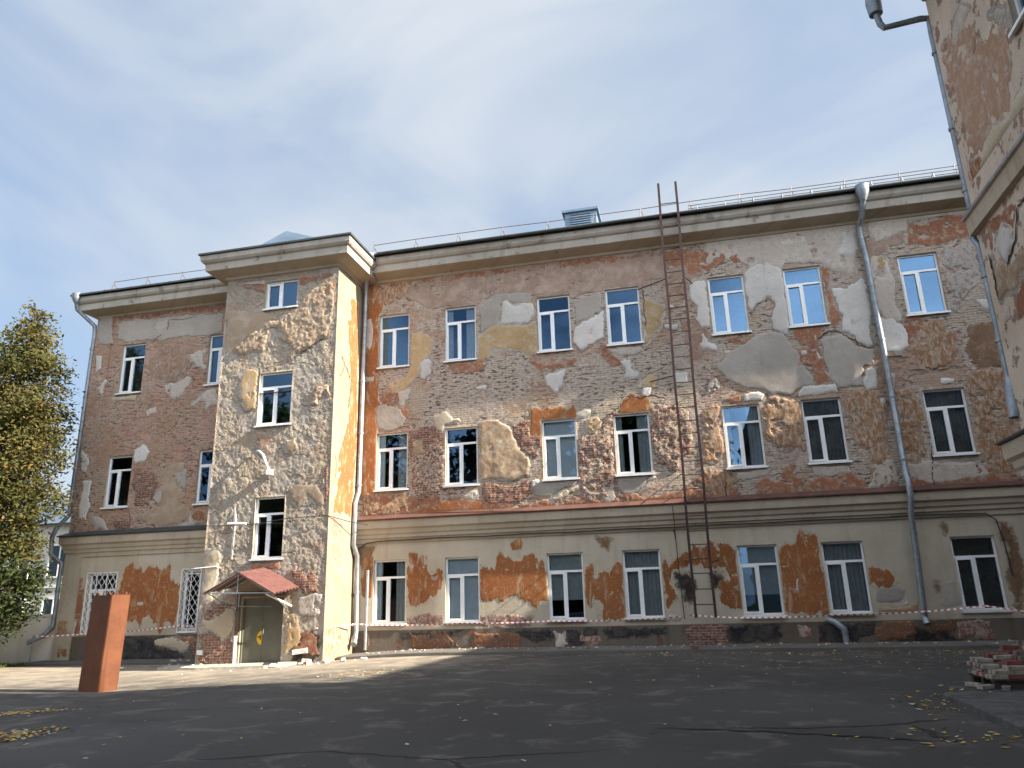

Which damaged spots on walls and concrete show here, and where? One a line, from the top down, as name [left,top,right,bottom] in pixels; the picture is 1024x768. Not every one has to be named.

peeling [940,24,1013,180]
flaking render [225,273,337,361]
peeling [793,265,841,385]
peeling [324,249,743,518]
flaking render [756,316,1023,494]
peeling [117,561,233,664]
flaking render [293,624,342,660]
peeling [405,552,458,649]
peeling [472,537,549,648]
peeling [584,560,626,625]
peeling [660,540,743,613]
peeling [777,527,831,639]